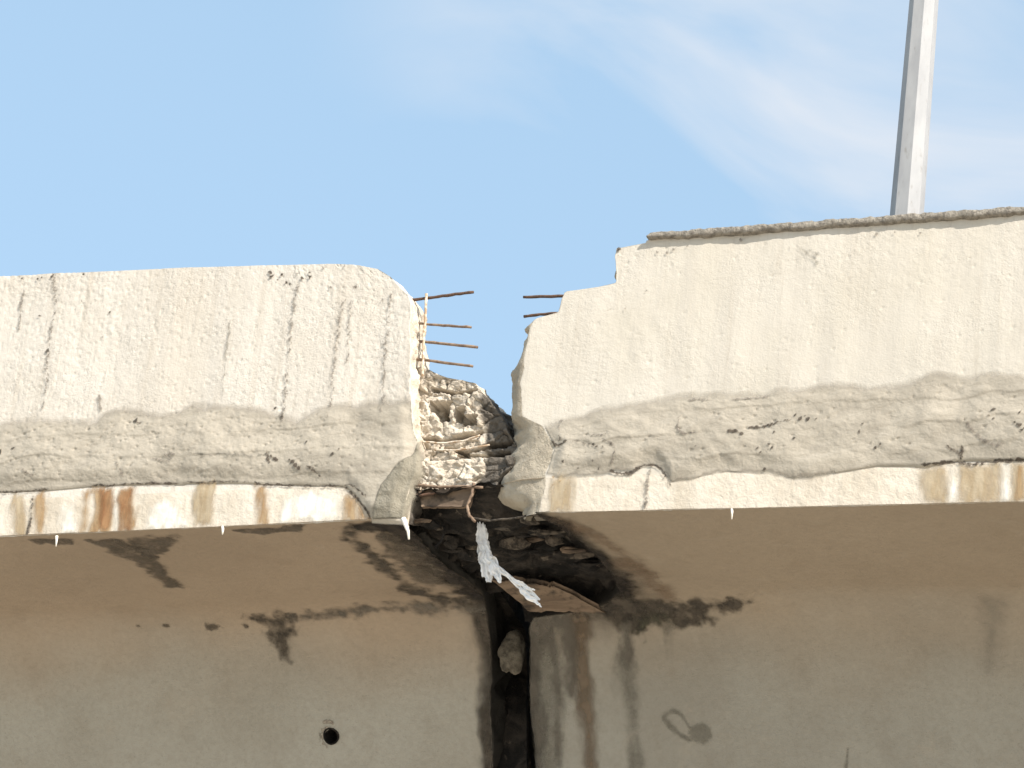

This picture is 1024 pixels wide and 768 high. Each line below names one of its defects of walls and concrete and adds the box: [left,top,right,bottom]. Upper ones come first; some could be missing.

spalling [412,291,601,569]
corrosion [12,491,45,535]
leakage [30,490,187,588]
corrosion [83,488,135,532]
corrosion [193,482,216,523]
corrosion [256,487,268,524]
leakage [538,515,578,539]
corrosion [922,463,1024,503]
leakage [243,518,491,657]
leakage [530,552,750,768]
leakage [480,709,492,768]